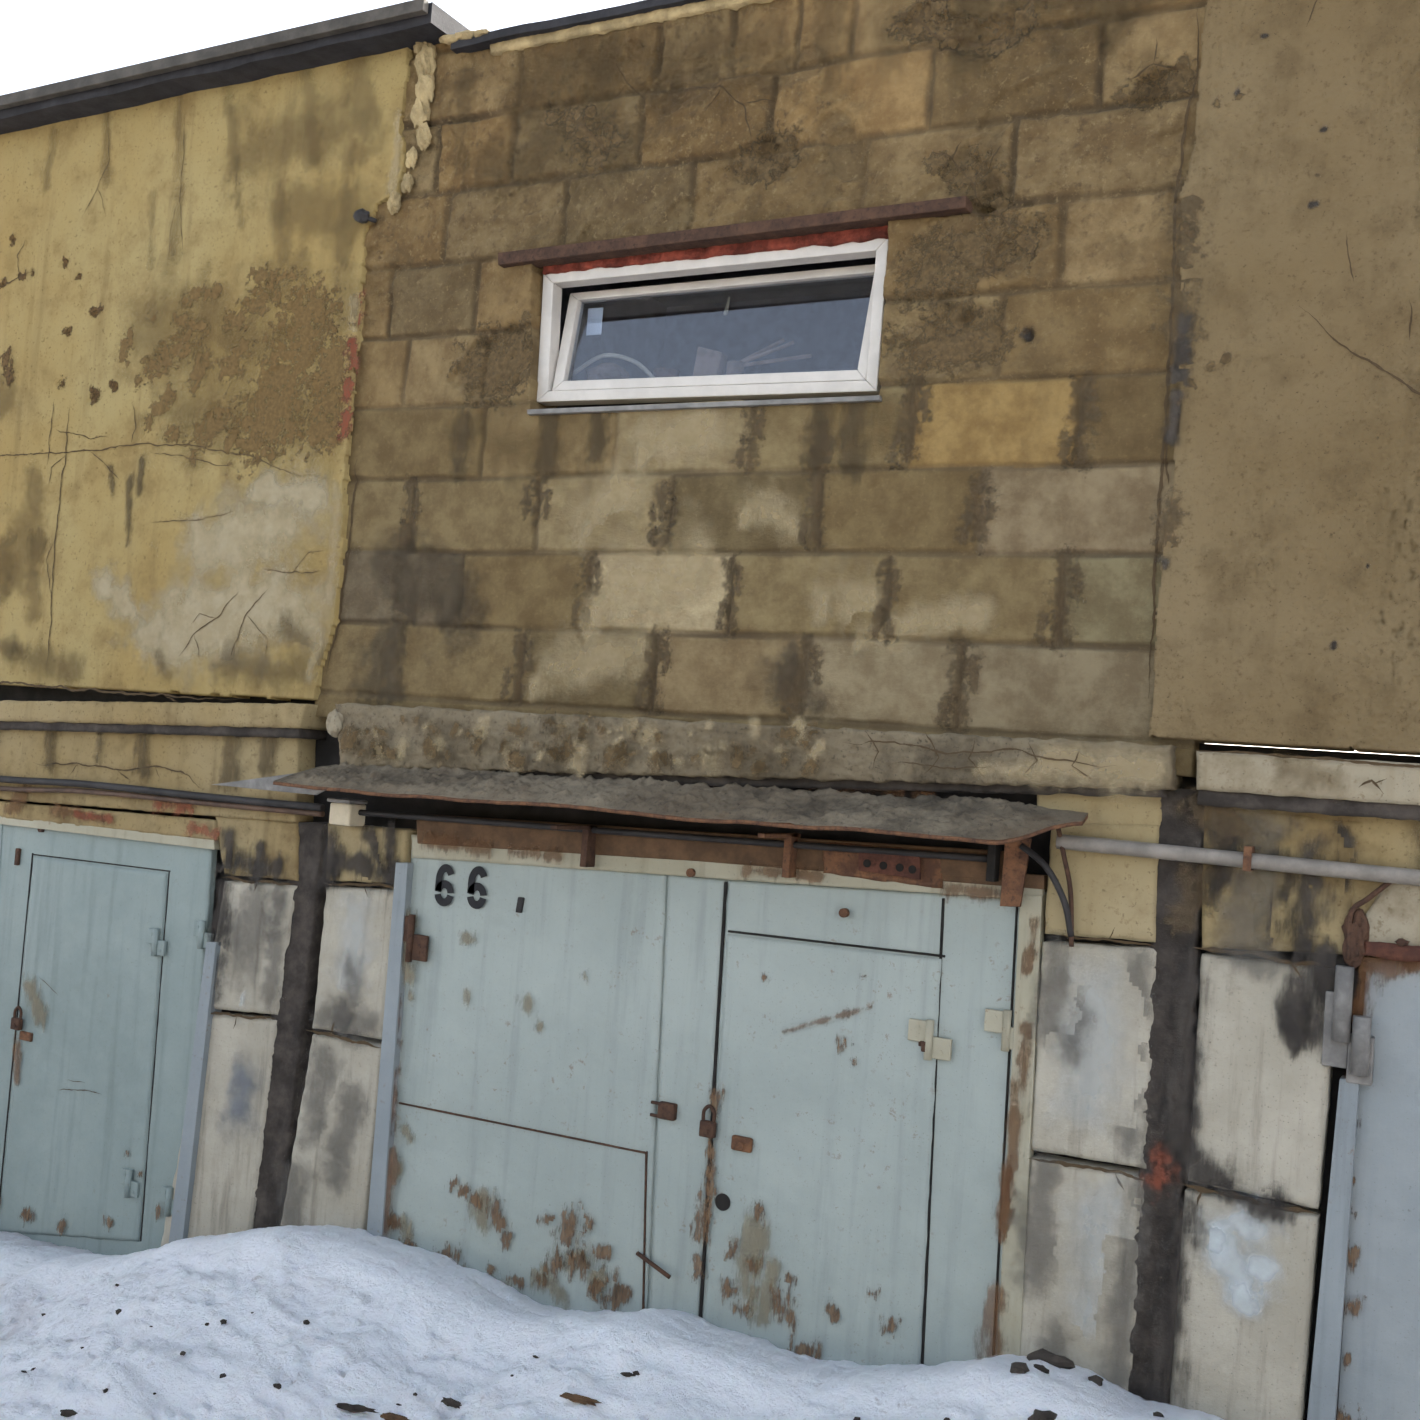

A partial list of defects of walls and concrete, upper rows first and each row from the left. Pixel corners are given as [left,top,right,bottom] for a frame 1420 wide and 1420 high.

spalling [0,270,35,288]
peeling [89,259,366,481]
crack [1303,309,1420,395]
crack [0,402,358,673]
corrosion [709,1088,725,1115]
corrosion [449,1175,632,1312]
corrosion [690,1138,717,1281]
corrosion [720,1240,763,1320]
corrosion [769,1271,822,1359]
corrosion [825,1302,840,1325]
corrosion [868,1287,902,1335]
water stain [1145,945,1295,1404]